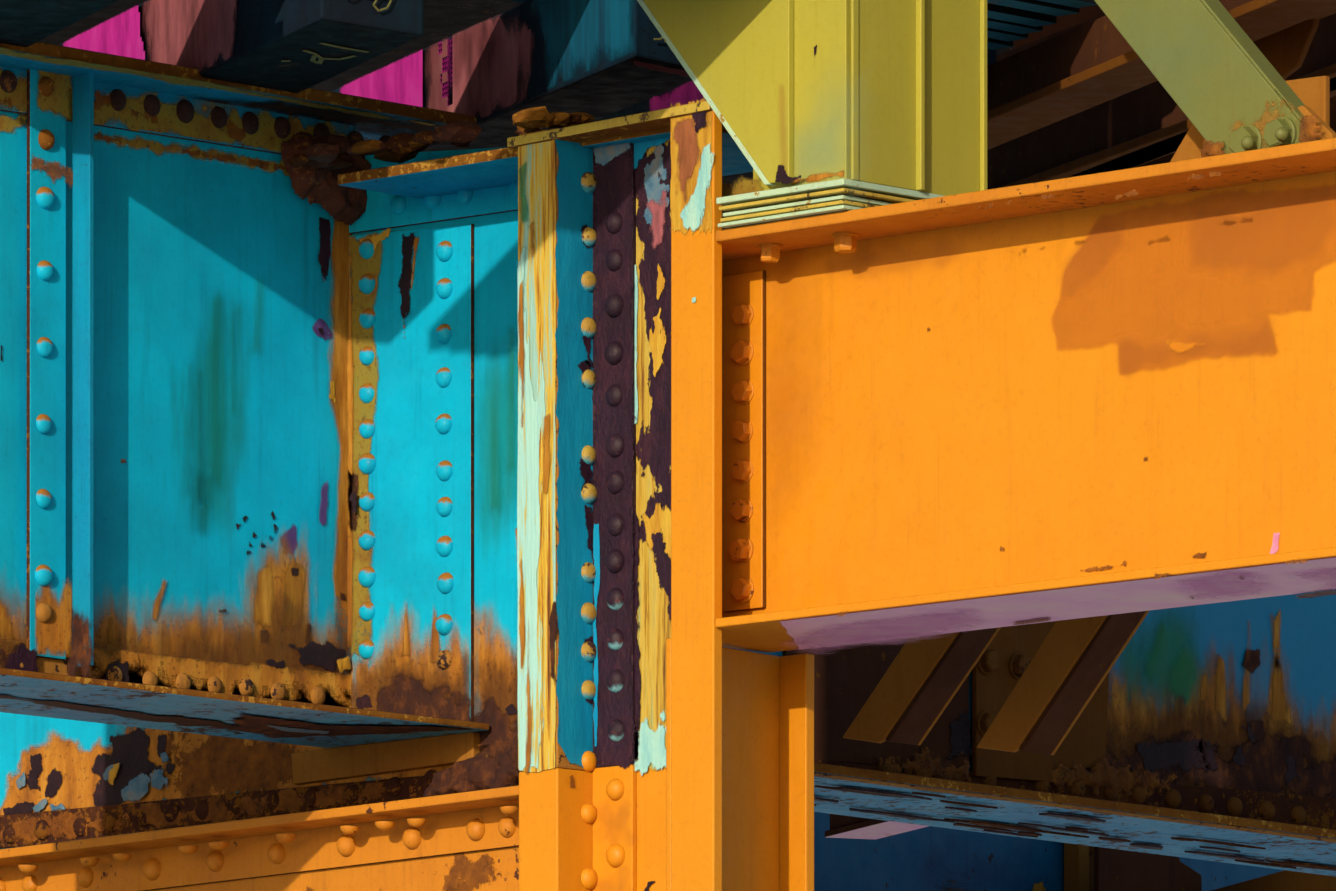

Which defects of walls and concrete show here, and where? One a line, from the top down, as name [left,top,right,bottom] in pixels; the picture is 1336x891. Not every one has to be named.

corrosion [0,47,444,176]
corrosion [1188,100,1326,180]
peeling [318,217,331,282]
peeling [398,233,419,338]
peeling [517,163,557,773]
peeling [592,137,671,769]
corrosion [0,219,520,844]
peeling [0,695,473,815]
corrosion [1051,610,1336,799]
corrosion [443,853,500,891]
peeling [814,785,1336,871]